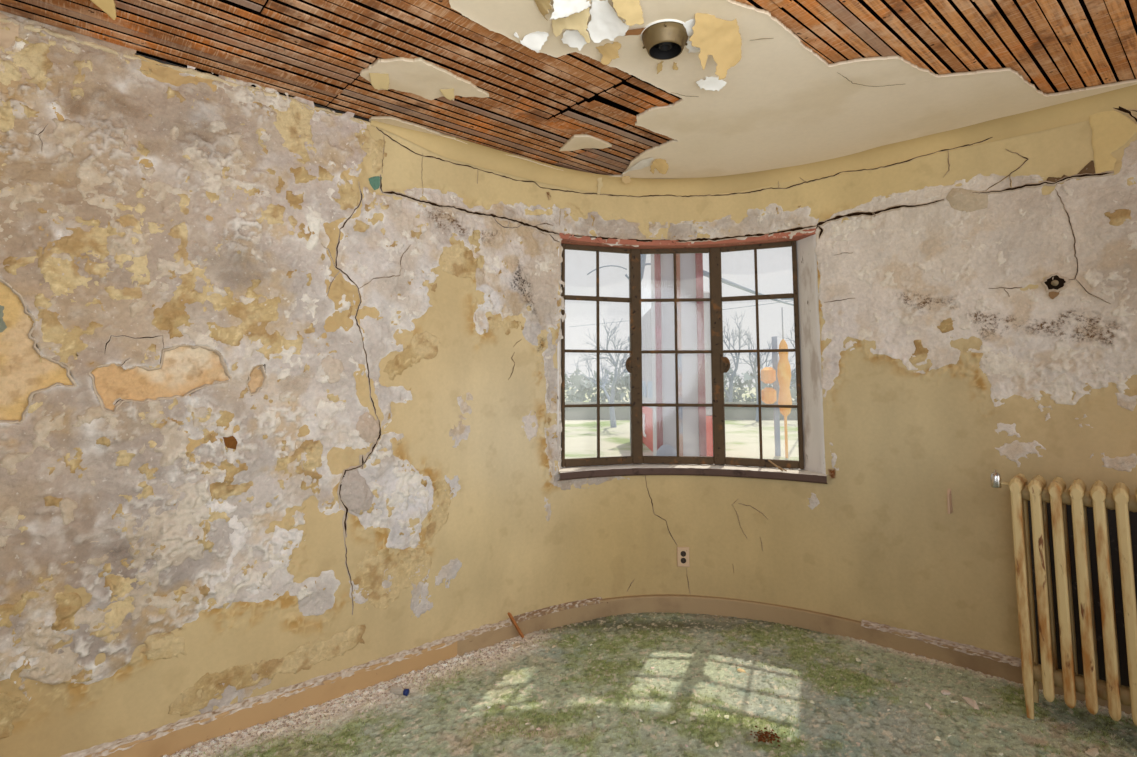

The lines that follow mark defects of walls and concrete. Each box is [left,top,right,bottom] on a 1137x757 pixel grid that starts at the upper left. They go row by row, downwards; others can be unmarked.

water stain [212,73,292,112]
peeling [514,0,647,65]
peeling [684,13,742,91]
water stain [0,88,198,318]
water stain [139,120,271,211]
water stain [207,285,351,326]
water stain [242,339,364,436]
peeling [0,10,646,685]
crack [321,127,1114,615]
peeling [649,140,1137,407]
water stain [0,395,305,698]
water stain [345,420,429,548]